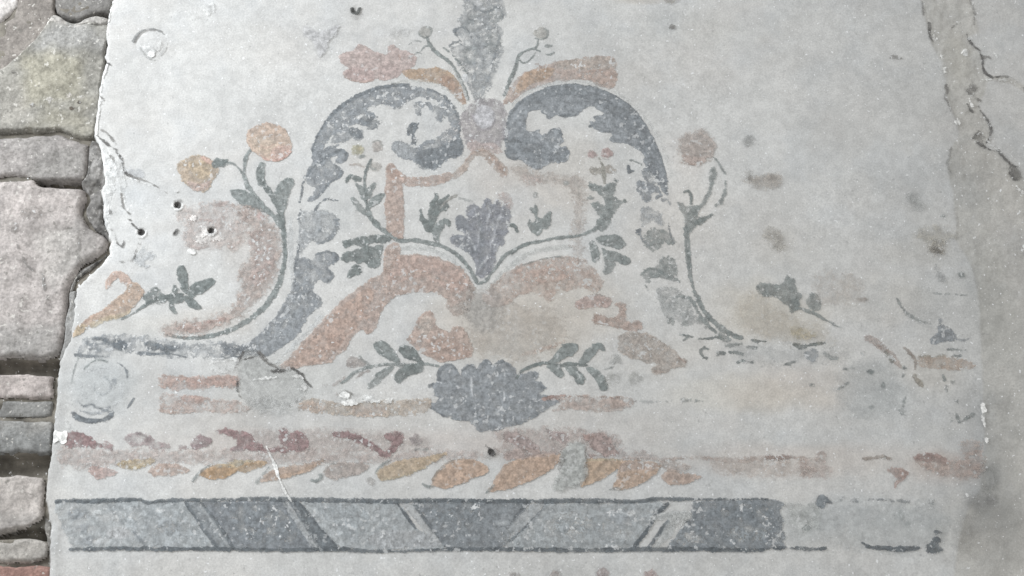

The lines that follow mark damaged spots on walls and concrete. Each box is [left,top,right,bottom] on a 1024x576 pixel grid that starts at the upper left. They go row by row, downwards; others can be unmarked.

crack [922,6,1024,196]
crack [212,351,312,397]